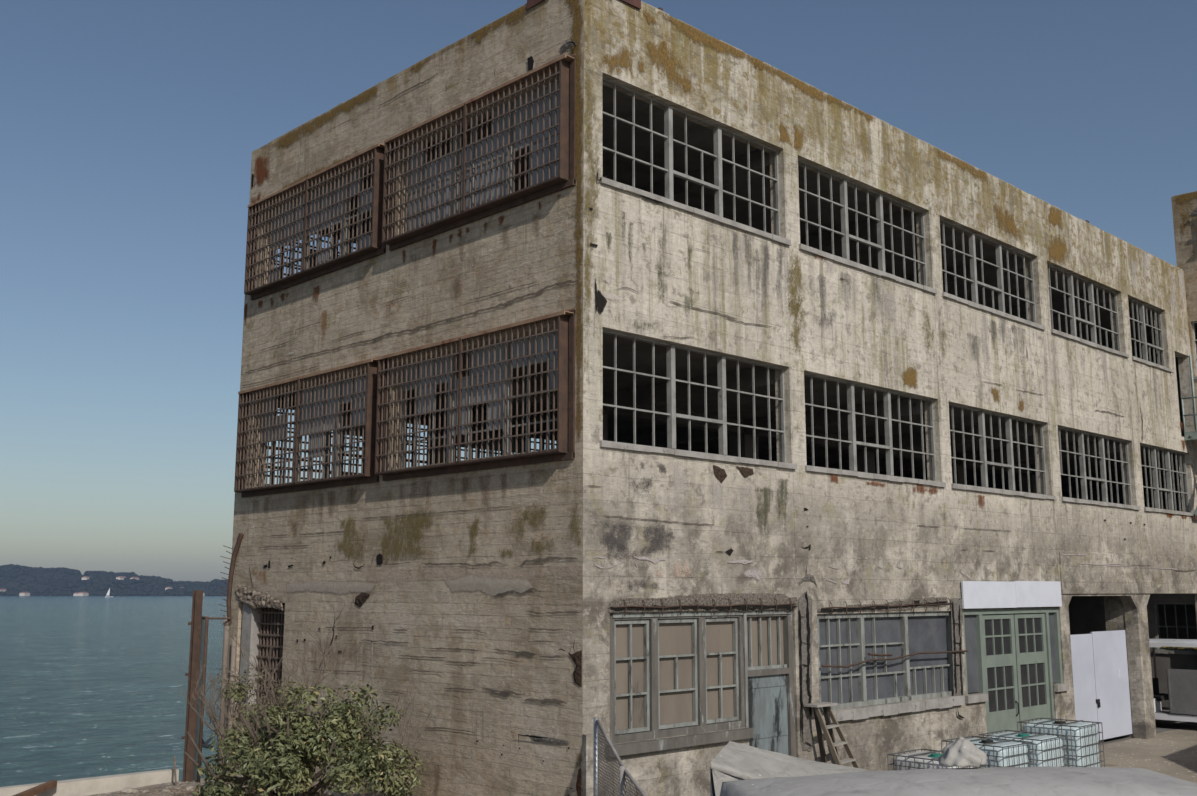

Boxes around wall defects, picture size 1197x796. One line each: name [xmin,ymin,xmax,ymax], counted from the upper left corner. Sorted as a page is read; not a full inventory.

rust [251,156,269,204]
spalling [595,280,607,314]
crack [665,301,773,342]
spalling [713,465,754,483]
spalling [353,592,370,608]